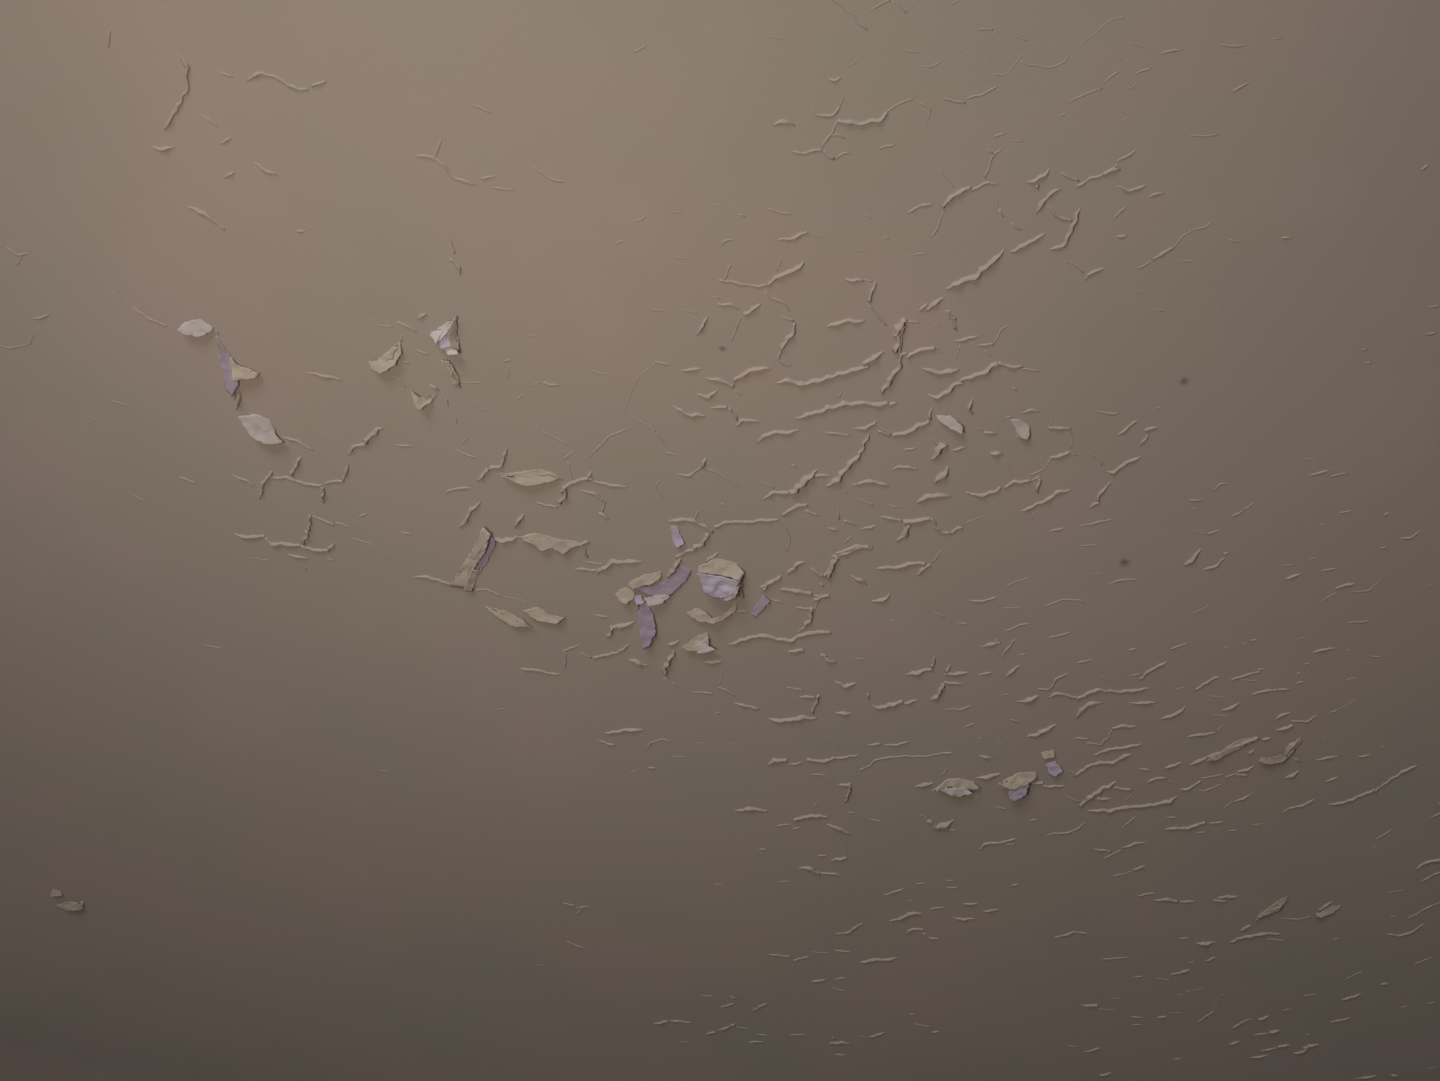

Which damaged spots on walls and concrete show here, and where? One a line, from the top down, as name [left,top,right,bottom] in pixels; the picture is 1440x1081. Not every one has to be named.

peeling [112,292,284,445]
peeling [368,313,483,410]
peeling [937,415,963,434]
peeling [1006,416,1030,441]
peeling [415,527,496,592]
peeling [628,526,745,625]
peeling [932,750,1076,802]